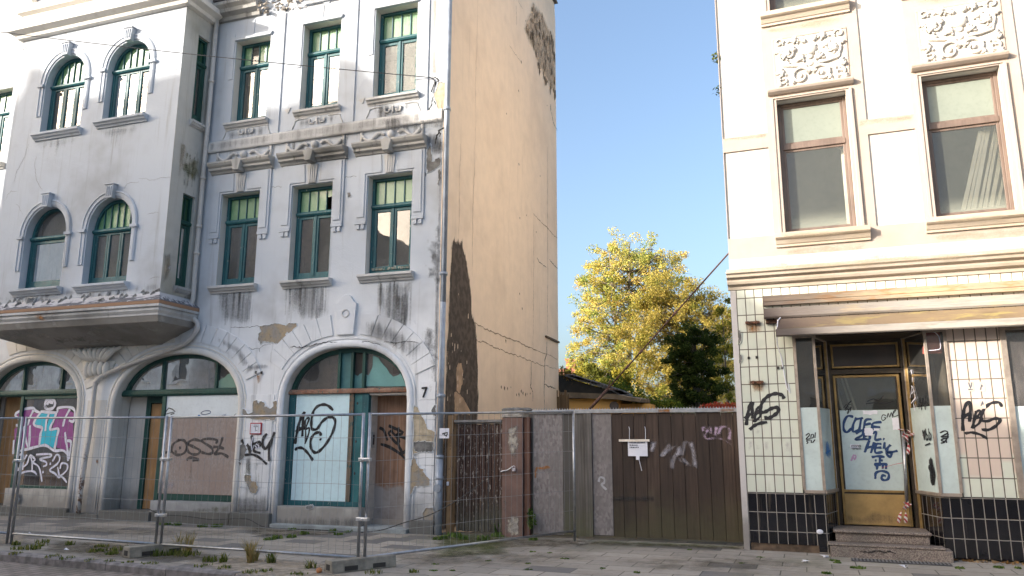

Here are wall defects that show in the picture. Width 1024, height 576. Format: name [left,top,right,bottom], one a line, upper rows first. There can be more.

spalling [526,3,556,100]
crack [474,152,558,409]
spalling [257,322,298,345]
spalling [242,399,278,422]
peeling [409,239,479,531]